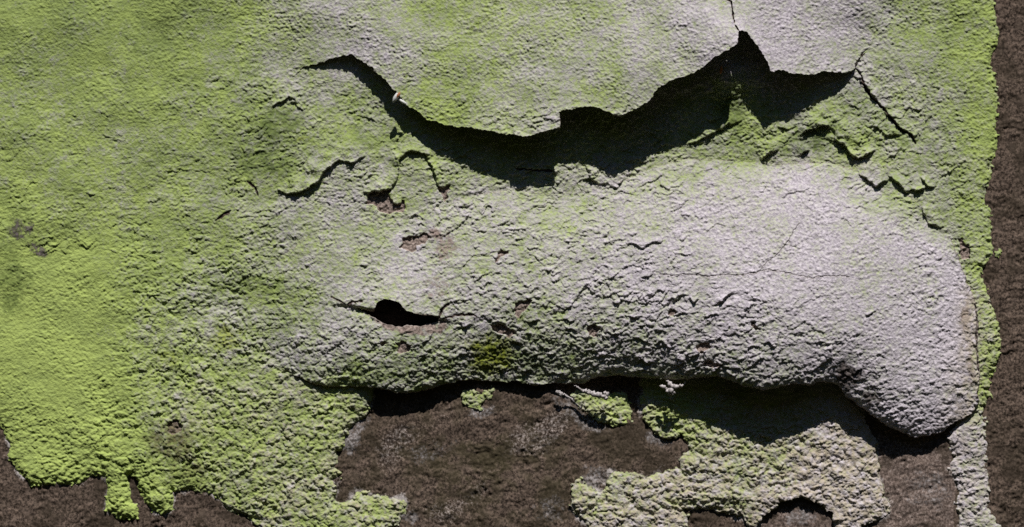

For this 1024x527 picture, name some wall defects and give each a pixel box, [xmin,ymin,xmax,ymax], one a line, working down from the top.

crack [855,53,916,144]
spalling [331,377,689,527]
spalling [683,496,834,527]
spalling [857,405,960,527]